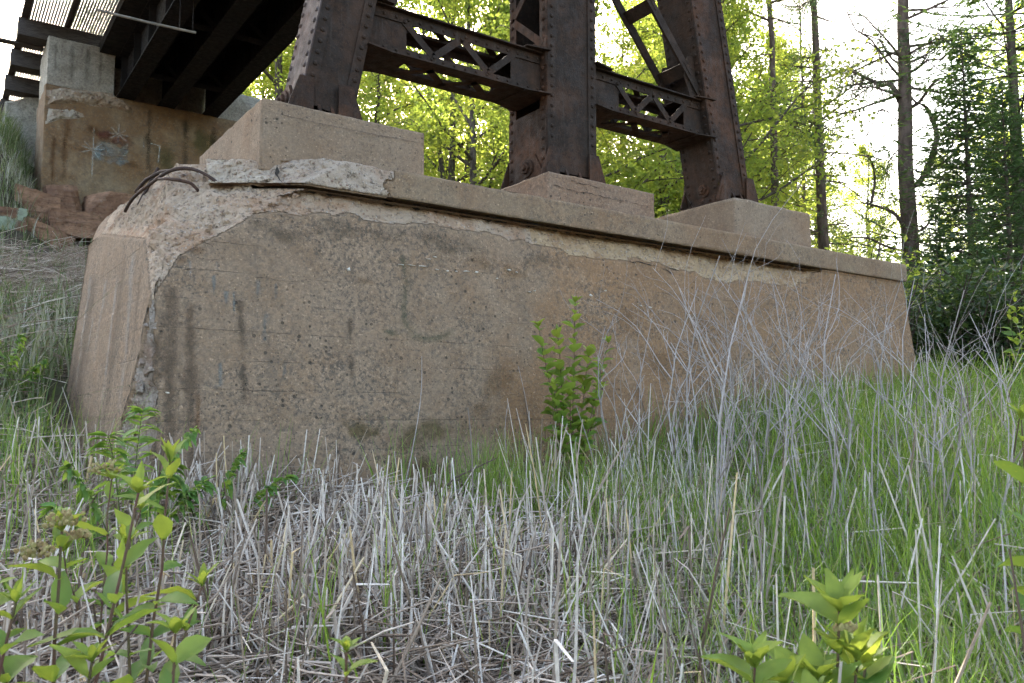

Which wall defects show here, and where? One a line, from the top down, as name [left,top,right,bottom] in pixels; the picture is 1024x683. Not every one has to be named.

spalling [101,158,819,511]